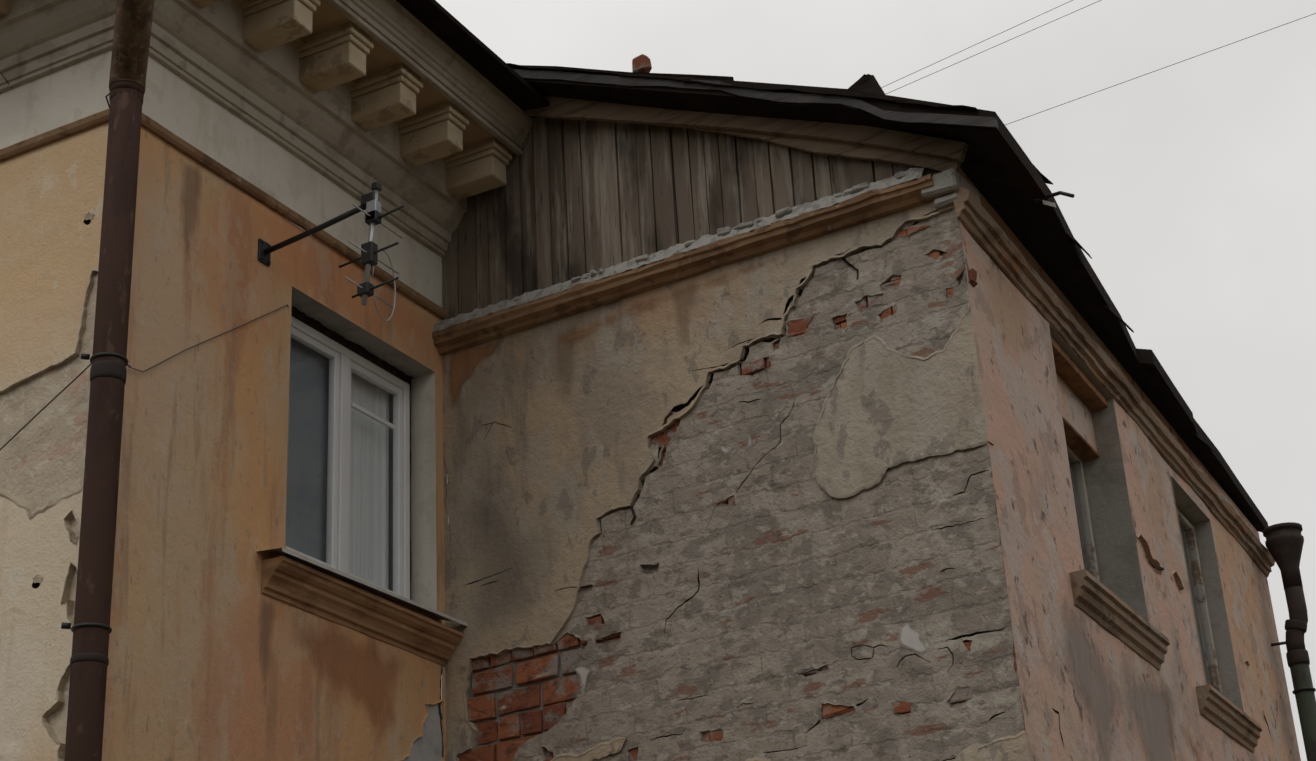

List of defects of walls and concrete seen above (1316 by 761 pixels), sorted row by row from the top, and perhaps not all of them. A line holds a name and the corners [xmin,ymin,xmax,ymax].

crack [841,249,870,280]
spalling [0,268,98,626]
crack [597,289,804,538]
spalling [397,206,1028,761]
crack [934,441,994,530]
spalling [41,663,71,761]